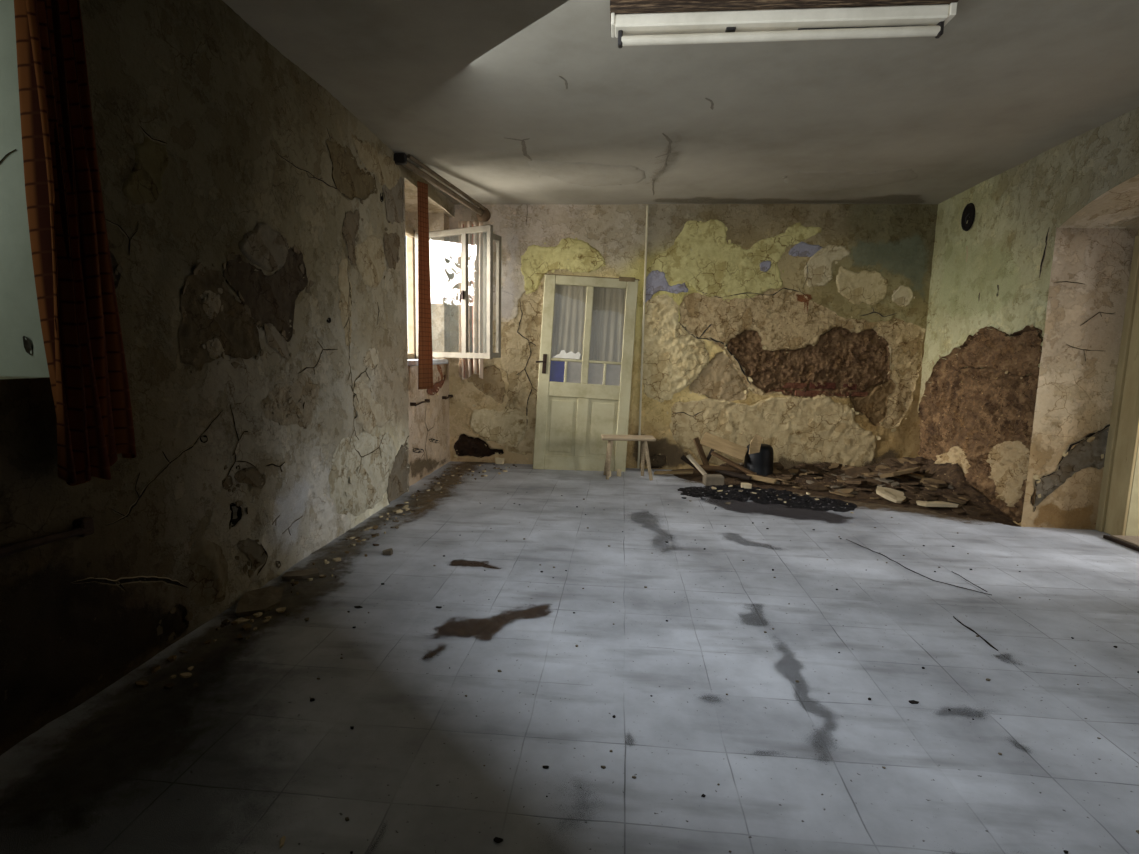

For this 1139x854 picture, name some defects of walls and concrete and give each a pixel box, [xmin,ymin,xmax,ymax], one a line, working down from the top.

spalling [326,137,404,280]
spalling [178,245,314,373]
crack [299,253,435,469]
spalling [454,238,605,458]
spalling [640,219,1109,523]
crack [106,405,285,525]
peeling [328,432,440,516]
leakage [739,603,842,763]